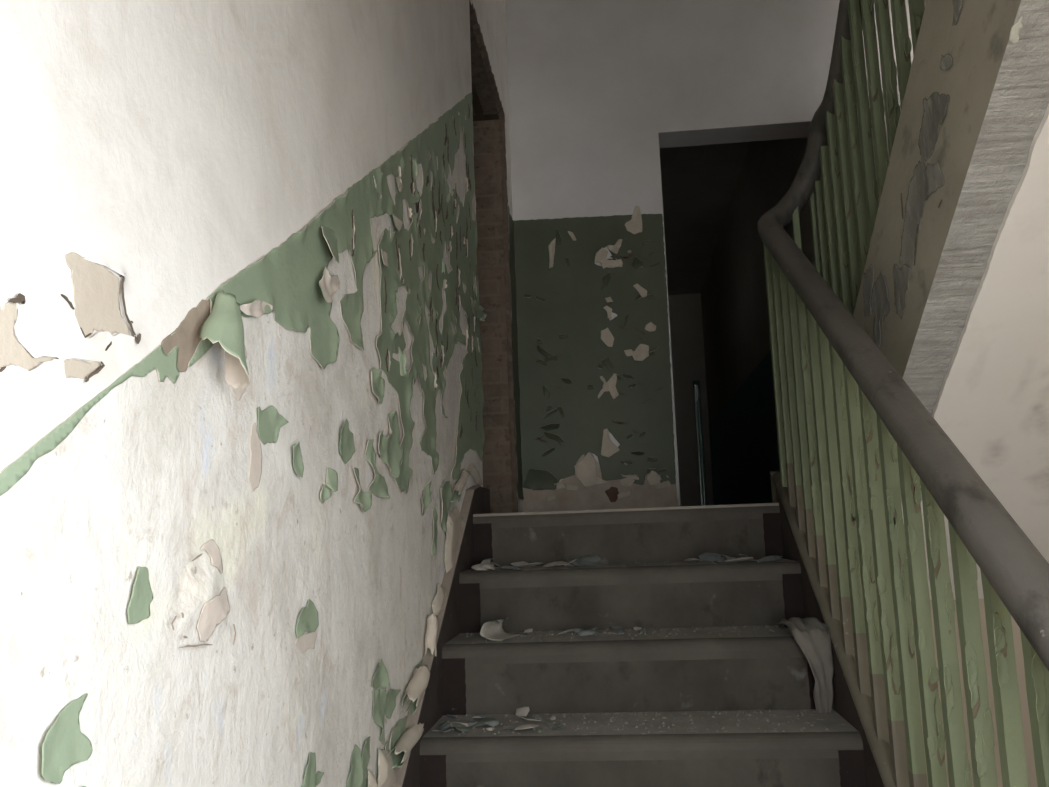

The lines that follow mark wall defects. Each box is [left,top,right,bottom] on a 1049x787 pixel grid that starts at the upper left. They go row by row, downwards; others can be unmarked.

peeling [469,3,676,513]
peeling [0,93,487,573]
peeling [127,566,153,624]
peeling [295,599,319,653]
peeling [346,583,499,787]
peeling [41,693,93,784]
peeling [302,752,324,787]